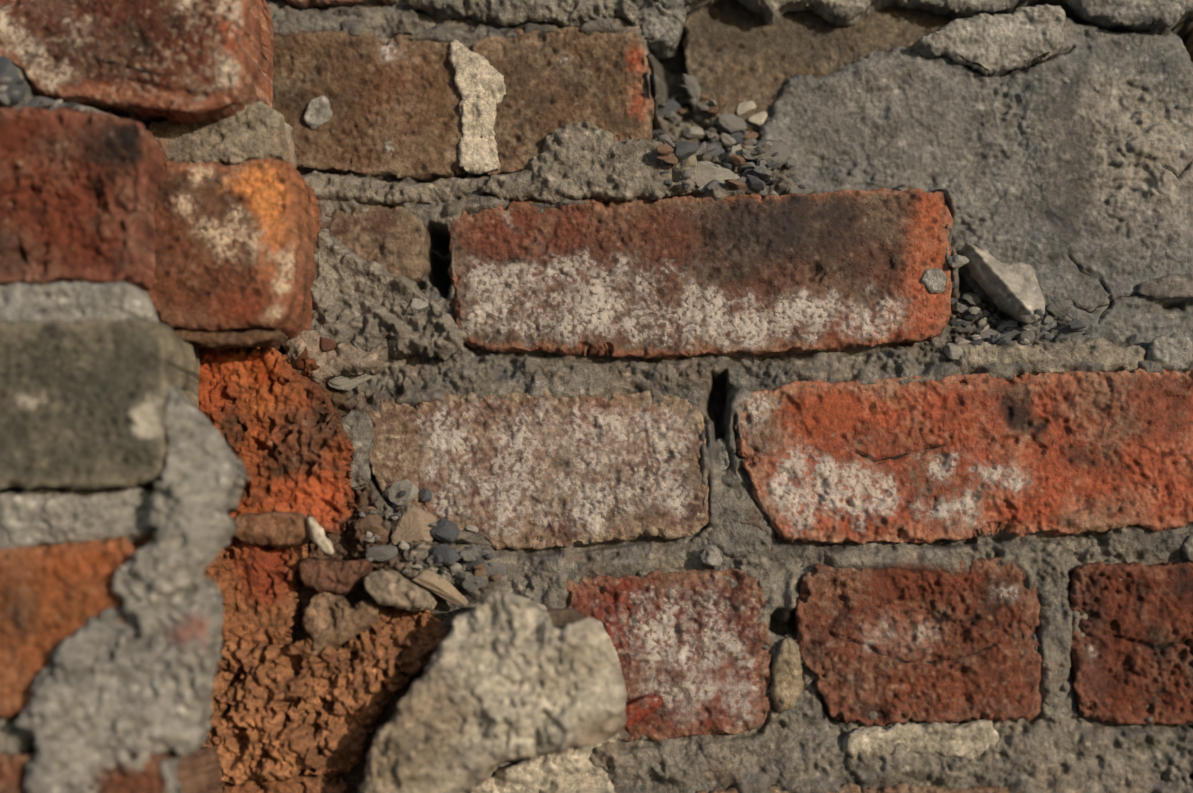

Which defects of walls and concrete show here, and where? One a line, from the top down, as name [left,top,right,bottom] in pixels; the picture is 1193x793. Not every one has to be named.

crack [1162,160,1193,179]
efflorescence [465,253,903,348]
crack [1066,254,1133,324]
efflorescence [738,394,769,421]
efflorescence [417,407,693,534]
efflorescence [770,447,898,532]
efflorescence [929,453,958,480]
efflorescence [916,492,980,525]
efflorescence [970,466,1026,491]
efflorescence [630,590,758,724]